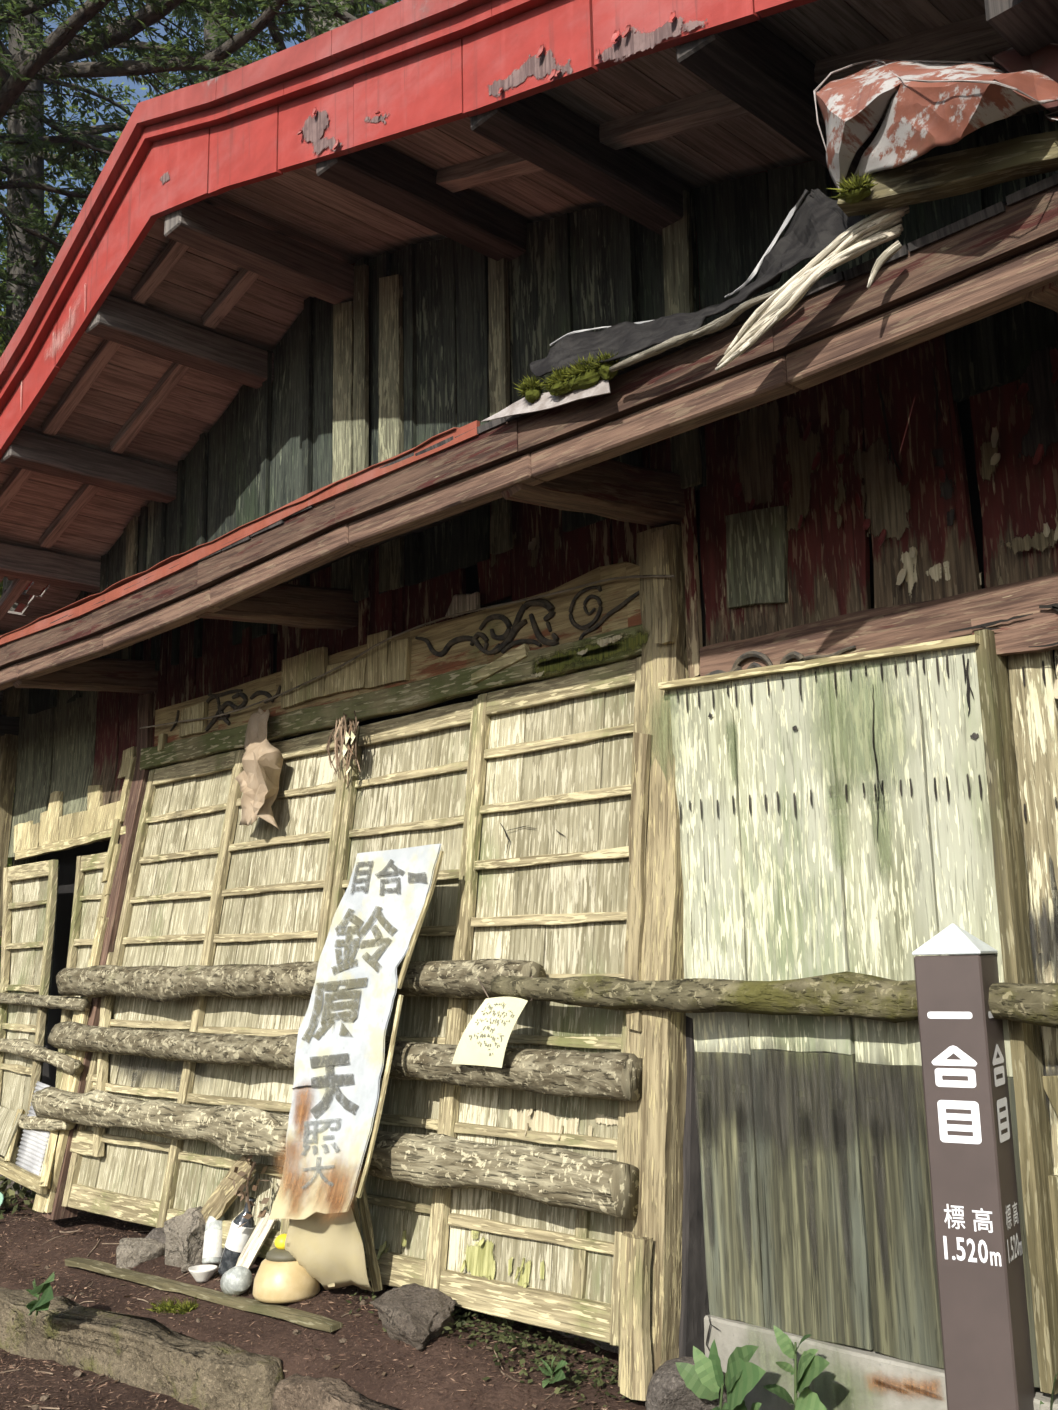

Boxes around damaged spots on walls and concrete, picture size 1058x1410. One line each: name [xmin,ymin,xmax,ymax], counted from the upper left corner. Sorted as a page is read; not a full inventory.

peeling [595,10,707,62]
peeling [488,44,573,100]
peeling [296,107,342,155]
peeling [734,399,780,509]
peeling [980,427,1001,482]
peeling [852,438,951,597]
peeling [1000,522,1058,555]